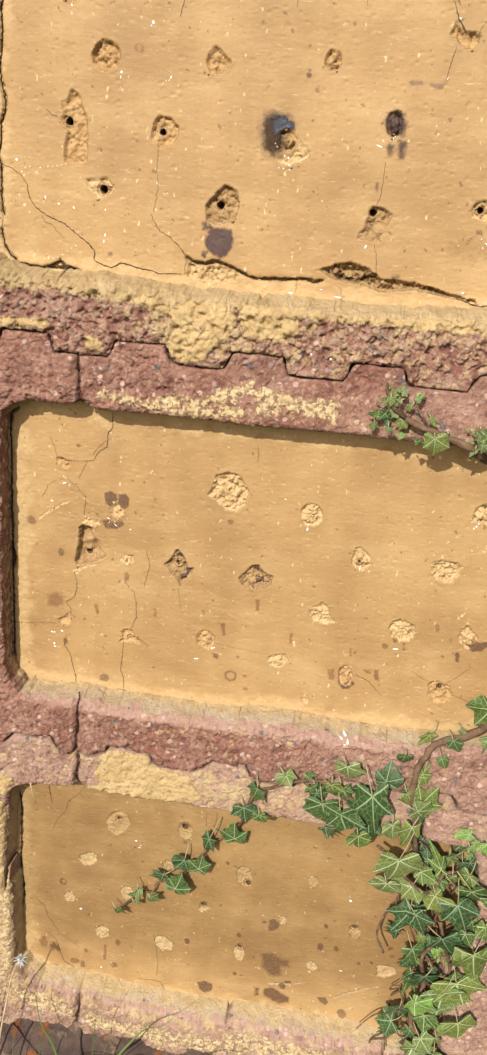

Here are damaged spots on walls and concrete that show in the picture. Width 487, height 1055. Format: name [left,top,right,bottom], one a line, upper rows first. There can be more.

crack [446,1,484,82]
crack [0,0,341,295]
water stain [202,223,233,258]
spalling [319,260,478,305]
crack [76,354,84,402]
crack [44,419,113,510]
crack [10,407,83,828]